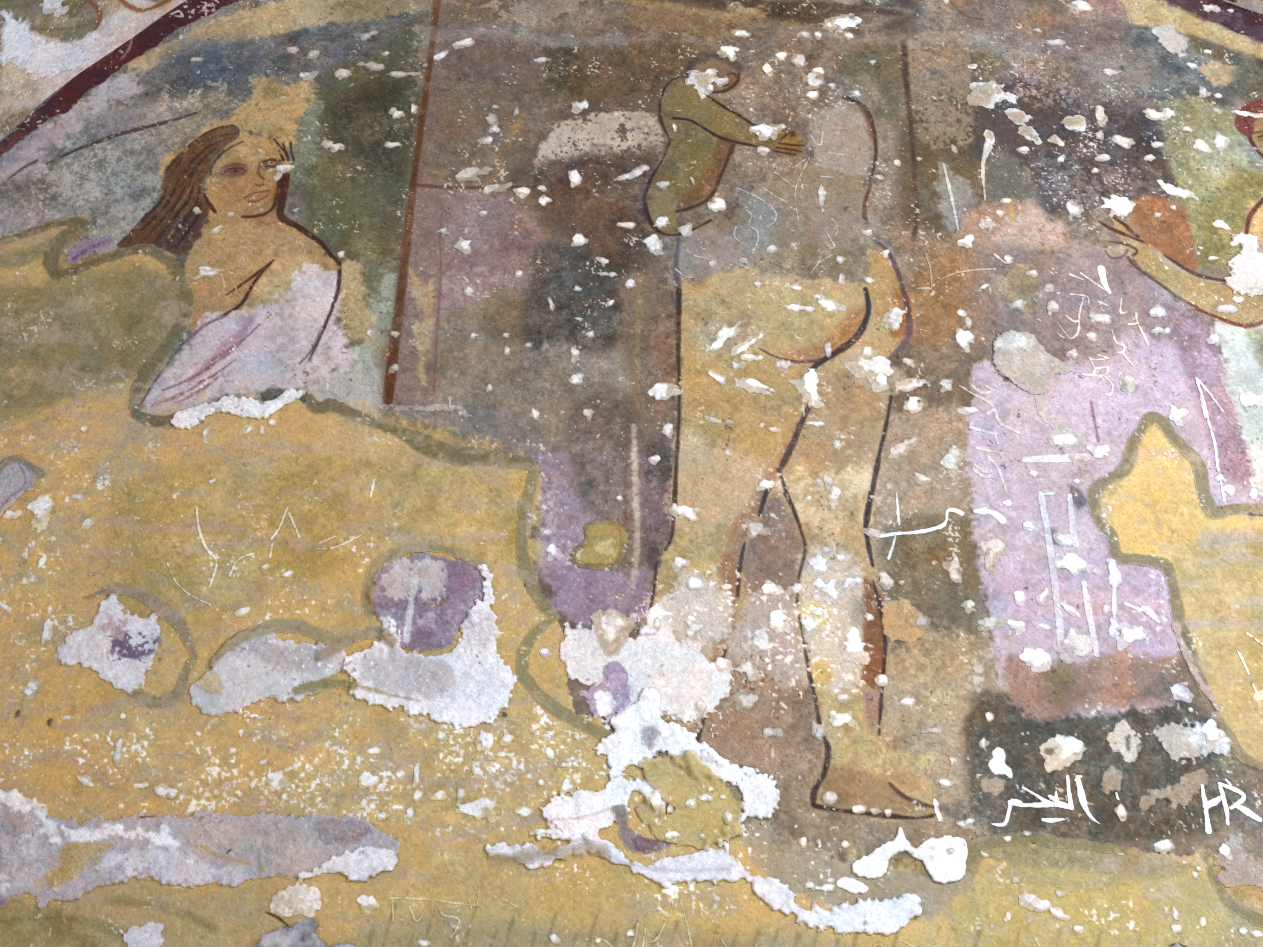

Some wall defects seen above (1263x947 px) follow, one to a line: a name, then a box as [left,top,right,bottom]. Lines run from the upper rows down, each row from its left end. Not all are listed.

peeling [797,13,863,41]
peeling [681,29,752,99]
peeling [761,51,861,100]
peeling [748,106,787,156]
peeling [965,63,1165,173]
peeling [1142,107,1230,156]
peeling [1100,194,1136,220]
flaking render [1198,219,1263,314]
peeling [703,321,826,427]
peeling [824,341,954,414]
peeling [170,387,306,445]
peeling [291,546,990,937]